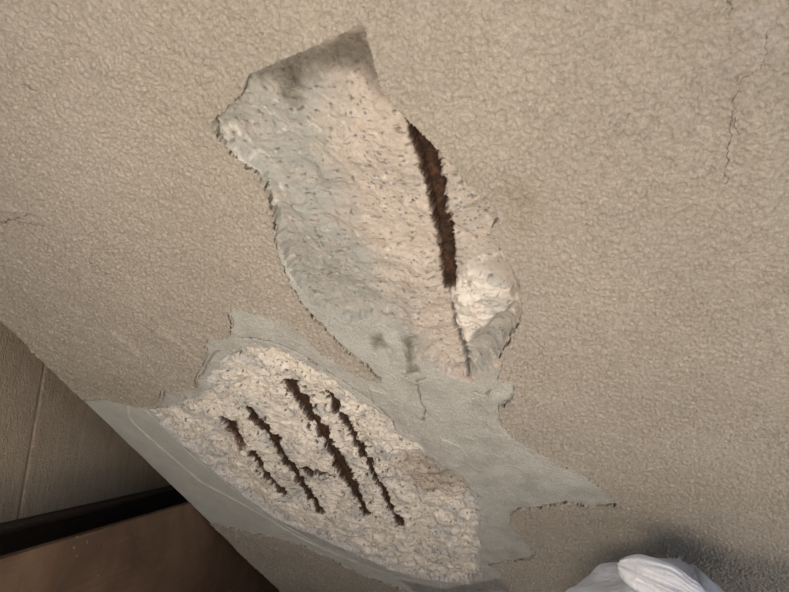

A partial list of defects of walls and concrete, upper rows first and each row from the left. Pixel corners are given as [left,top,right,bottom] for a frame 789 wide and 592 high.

spalling [85,25,614,592]